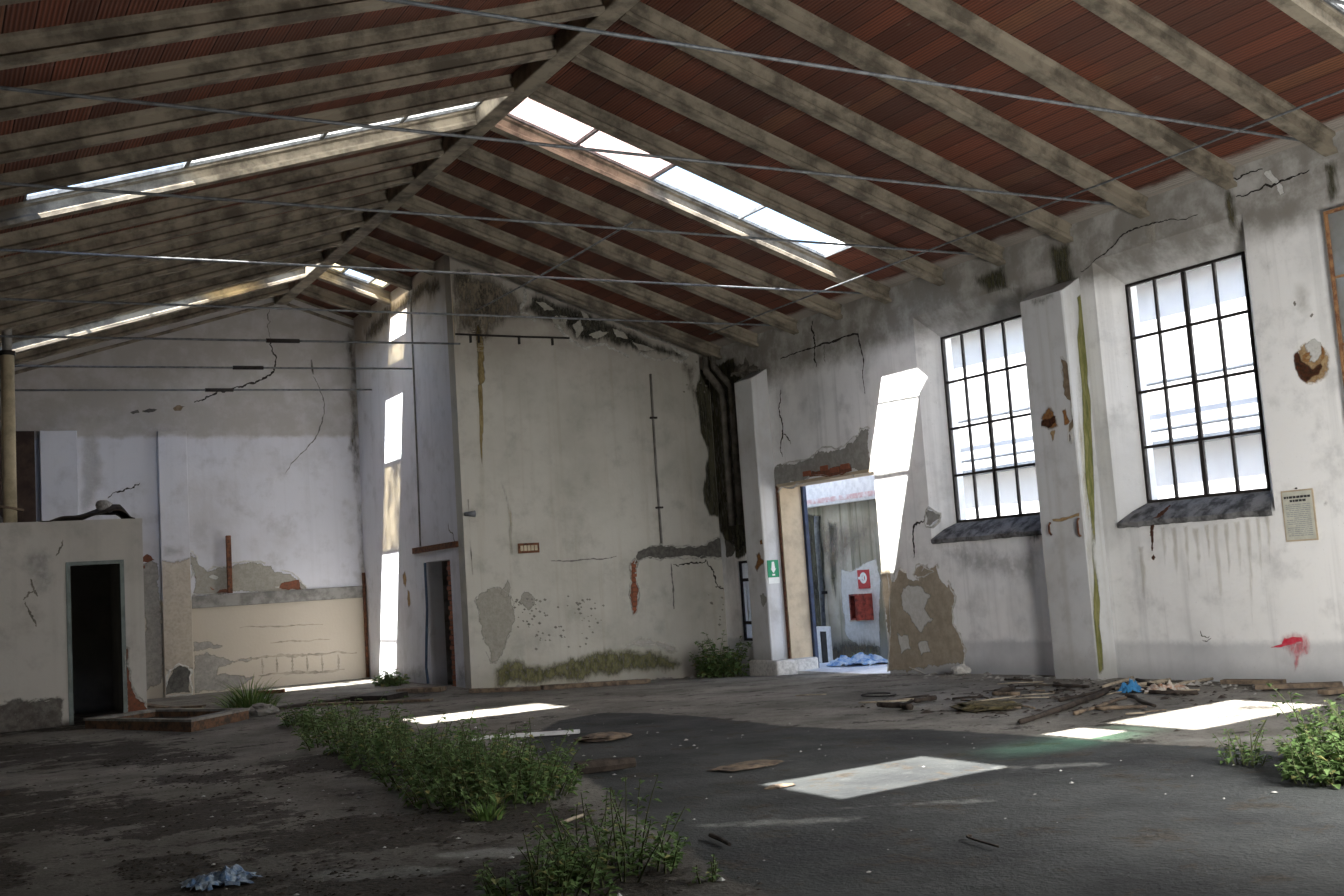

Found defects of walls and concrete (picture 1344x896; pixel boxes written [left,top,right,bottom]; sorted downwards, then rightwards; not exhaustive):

crack [1234,169,1309,197]
crack [194,309,277,403]
crack [286,360,325,472]
crack [778,321,865,457]
flaking render [774,426,875,494]
peeling [125,551,307,712]
peeling [474,581,605,664]
flaking render [628,496,736,615]
flaking render [807,490,967,674]